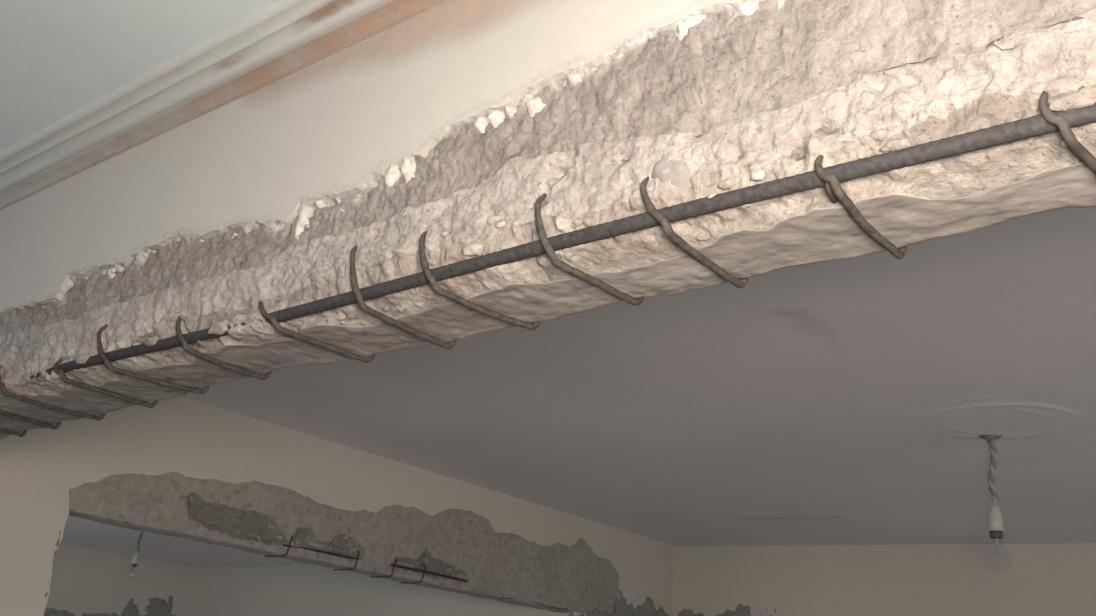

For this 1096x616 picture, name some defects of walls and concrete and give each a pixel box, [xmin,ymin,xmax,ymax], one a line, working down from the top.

spalling [0,0,1096,403]
spalling [69,472,619,615]